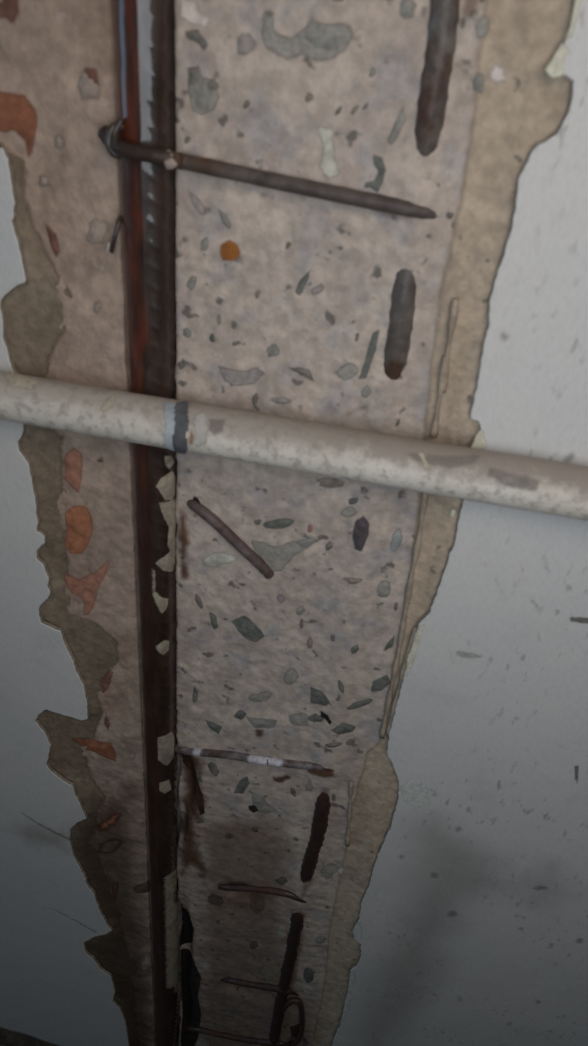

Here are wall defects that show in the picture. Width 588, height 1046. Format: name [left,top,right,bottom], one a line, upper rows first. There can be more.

spalling [0,0,580,449]
corrosion [179,516,188,578]
corrosion [180,755,204,870]
spalling [20,424,462,1046]
corrosion [308,766,333,777]